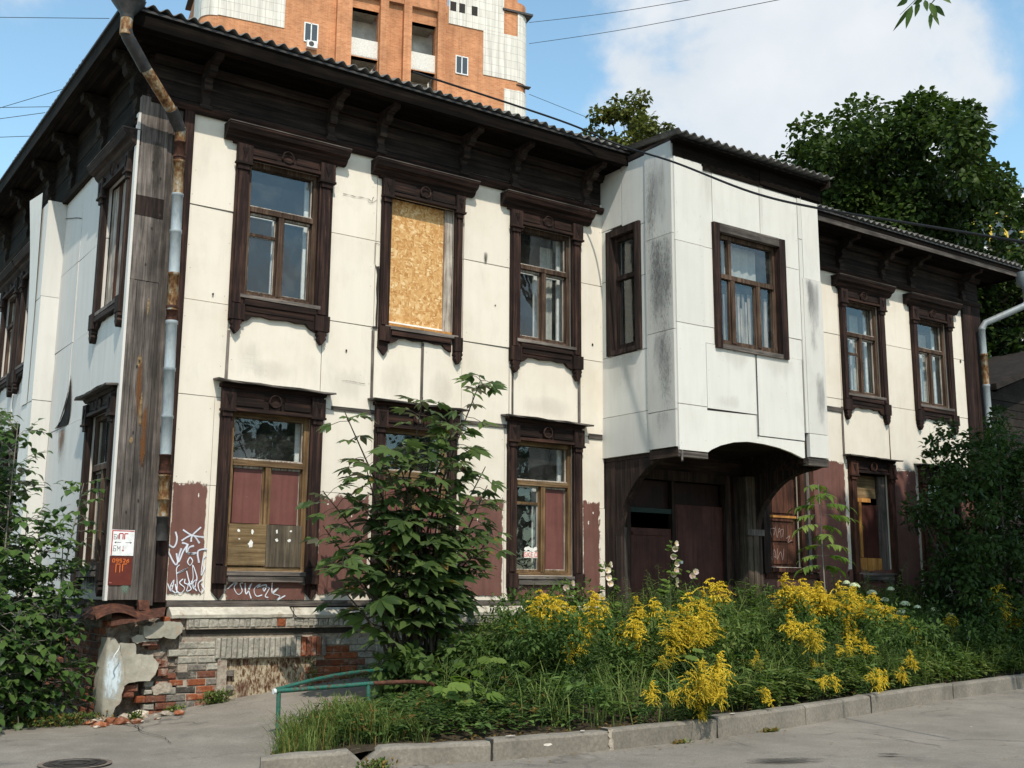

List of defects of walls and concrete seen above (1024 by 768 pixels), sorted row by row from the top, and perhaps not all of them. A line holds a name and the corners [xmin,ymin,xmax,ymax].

rust [152,144,162,184]
rust [136,364,147,459]
spalling [106,616,183,718]